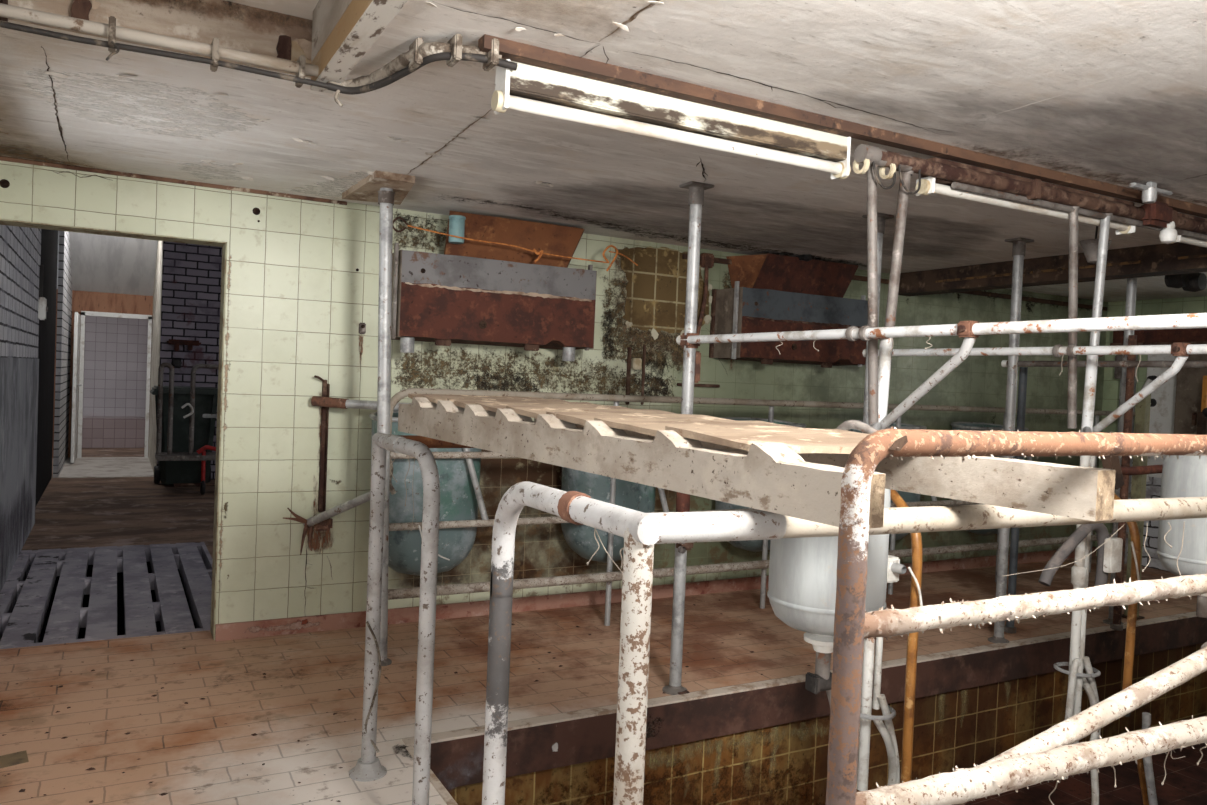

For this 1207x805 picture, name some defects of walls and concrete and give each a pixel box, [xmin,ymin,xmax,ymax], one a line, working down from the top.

crack [41,46,113,181]
crack [426,0,964,135]